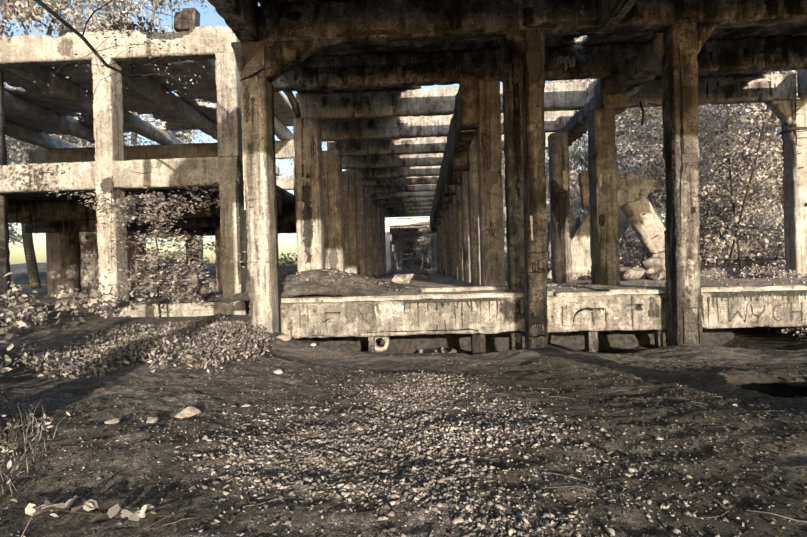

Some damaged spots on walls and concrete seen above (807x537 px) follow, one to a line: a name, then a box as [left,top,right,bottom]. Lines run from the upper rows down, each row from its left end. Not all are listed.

water stain [766,0,803,17]
water stain [241,71,317,333]